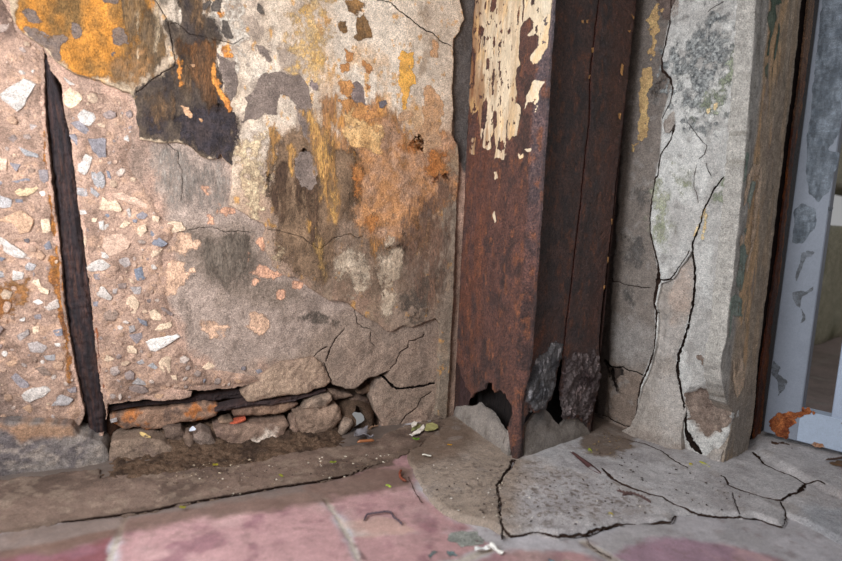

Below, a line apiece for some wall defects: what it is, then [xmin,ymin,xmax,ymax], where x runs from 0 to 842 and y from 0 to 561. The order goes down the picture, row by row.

rust [14,0,167,87]
rust [221,45,233,58]
crack [378,0,451,46]
water stain [133,0,452,326]
rust [302,48,459,264]
peeling [792,0,842,281]
peeling [0,0,464,437]
crack [603,0,724,468]
crack [382,334,435,423]
spalling [684,387,732,437]
rust [769,407,815,439]
crack [495,452,825,559]